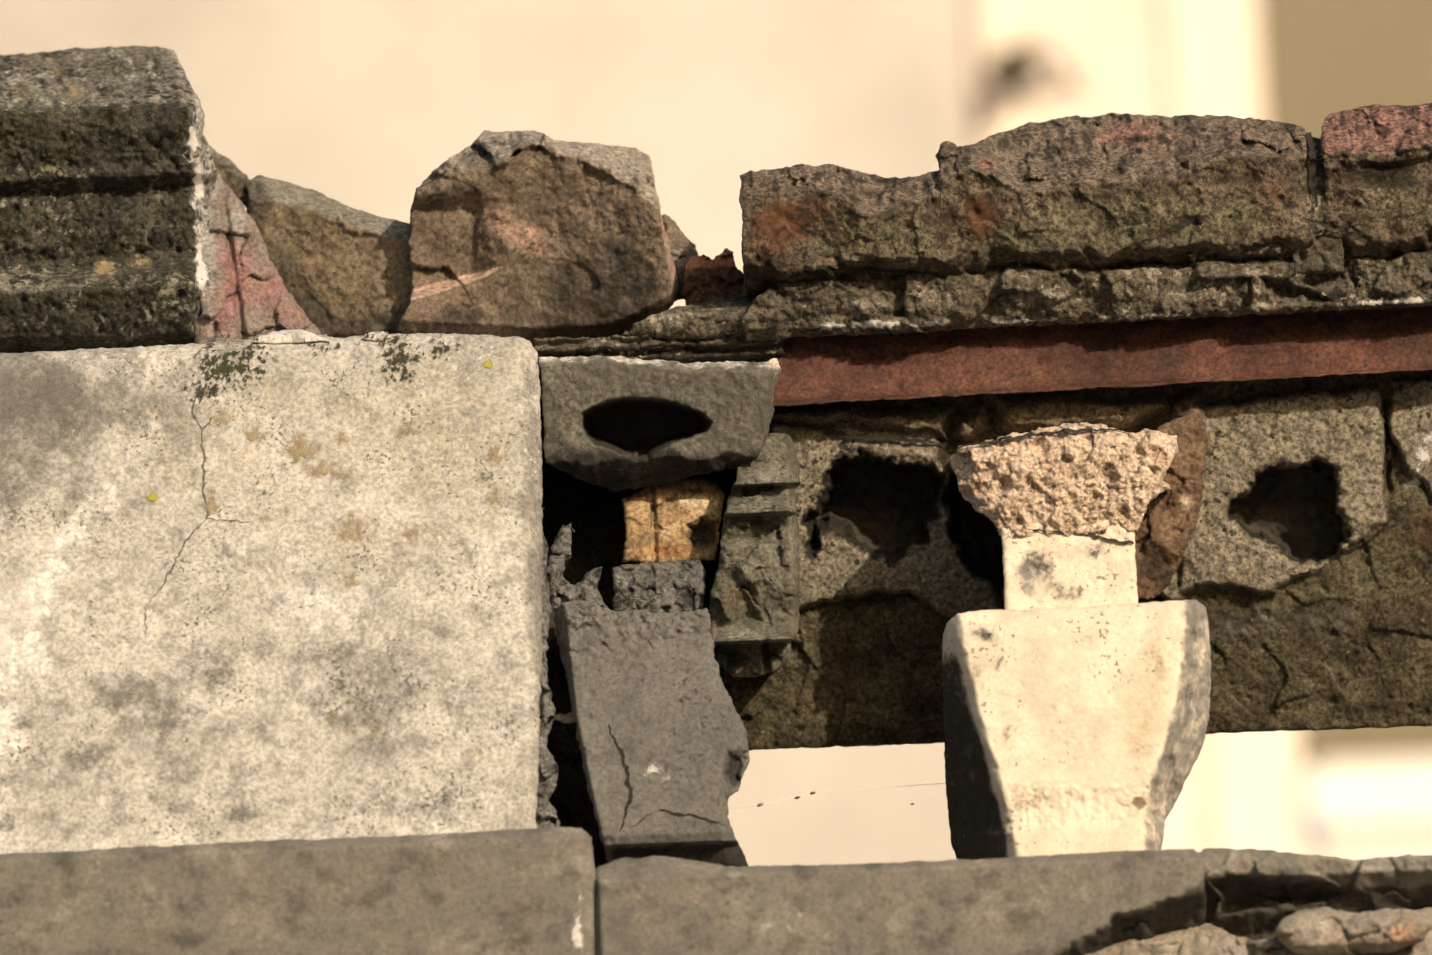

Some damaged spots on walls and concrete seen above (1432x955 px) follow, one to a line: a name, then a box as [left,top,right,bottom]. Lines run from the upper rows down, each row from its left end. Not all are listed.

crack [144,395,254,637]
crack [1028,529,1134,545]
crack [609,724,722,831]